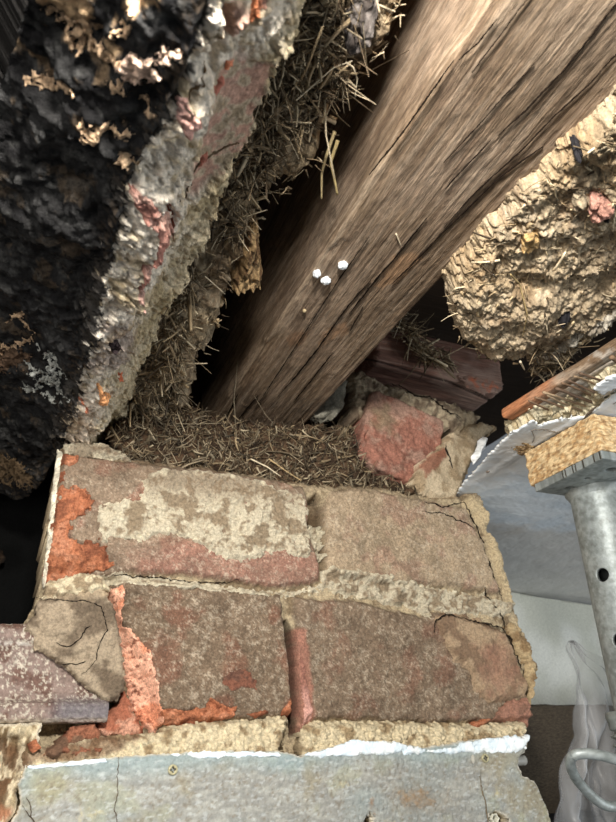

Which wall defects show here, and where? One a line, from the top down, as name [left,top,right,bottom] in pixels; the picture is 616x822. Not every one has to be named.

spalling [0,0,28,83]
peeling [5,311,36,334]
spalling [42,0,306,583]
crack [422,502,524,674]
crack [36,597,108,674]
crack [112,757,120,822]
spalling [0,585,237,822]
peeling [171,750,281,759]
peeling [305,698,533,758]